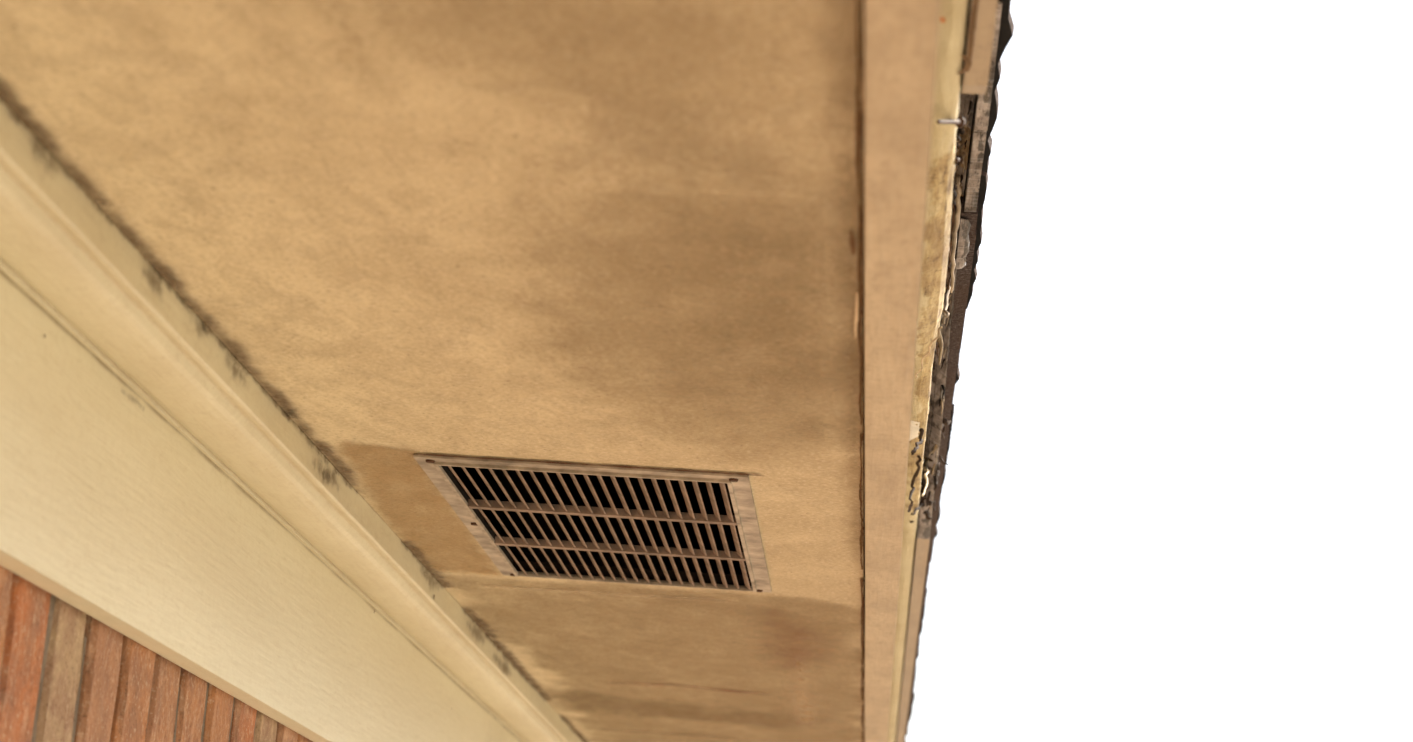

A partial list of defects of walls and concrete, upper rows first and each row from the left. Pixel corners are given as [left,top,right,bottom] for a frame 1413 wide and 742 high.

water stain [0,82,107,212]
water stain [937,94,966,364]
peeling [955,218,971,269]
peeling [909,375,920,443]